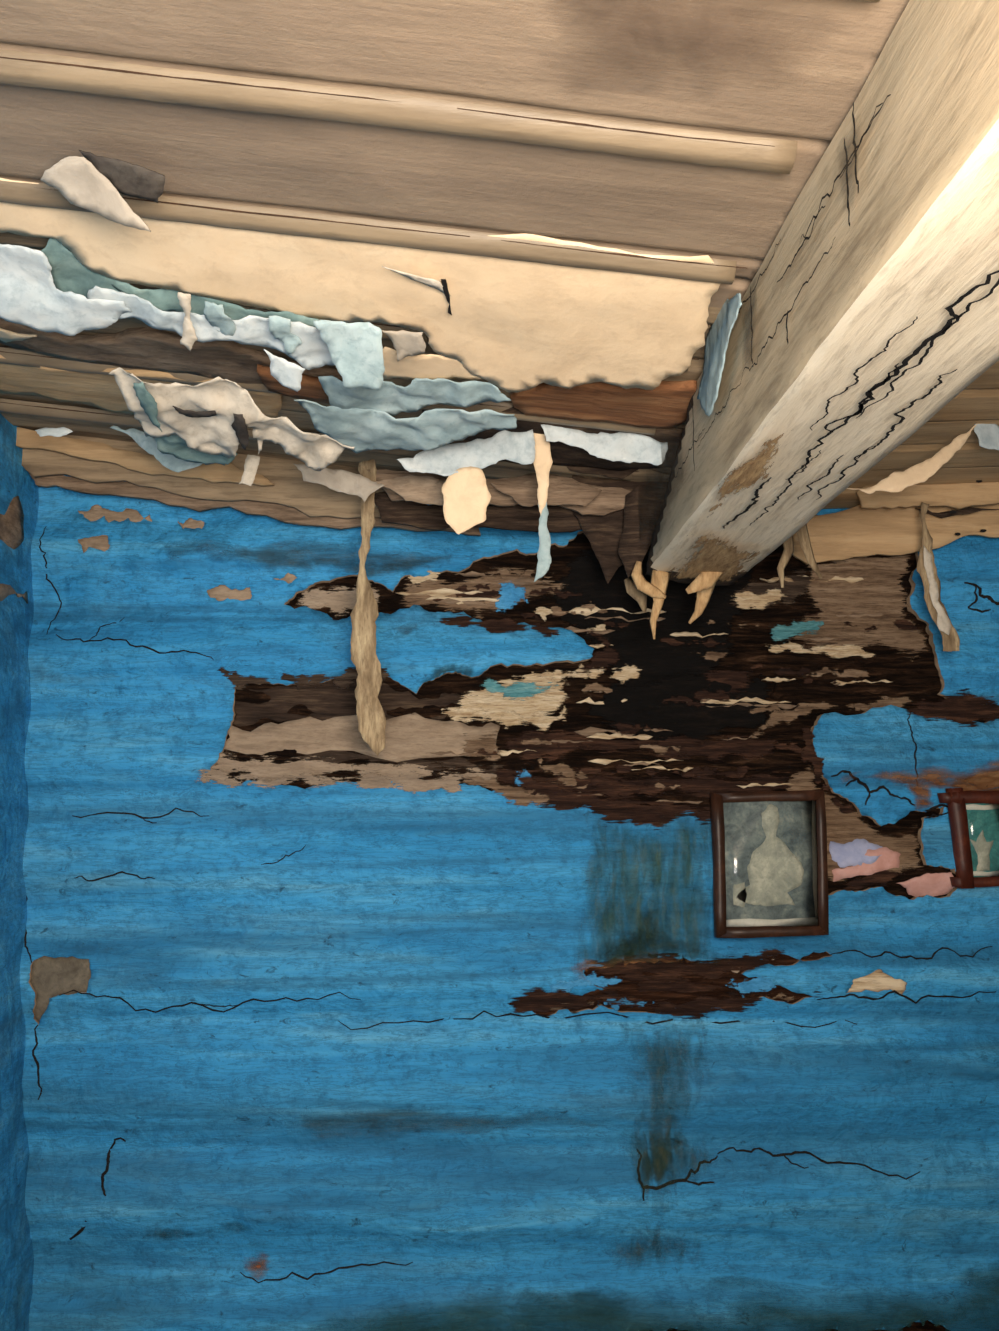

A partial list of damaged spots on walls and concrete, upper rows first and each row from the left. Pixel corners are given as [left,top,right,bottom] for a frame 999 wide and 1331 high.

peeling [0,202,720,392]
crack [672,94,891,478]
peeling [0,496,24,549]
flaking render [196,533,999,899]
damp [595,830,697,967]
flaking render [30,956,91,1023]
crack [59,990,673,1030]
flaking render [507,948,831,1019]
crack [32,1025,42,1100]
crack [636,1147,920,1201]
flaking render [874,1320,950,1331]